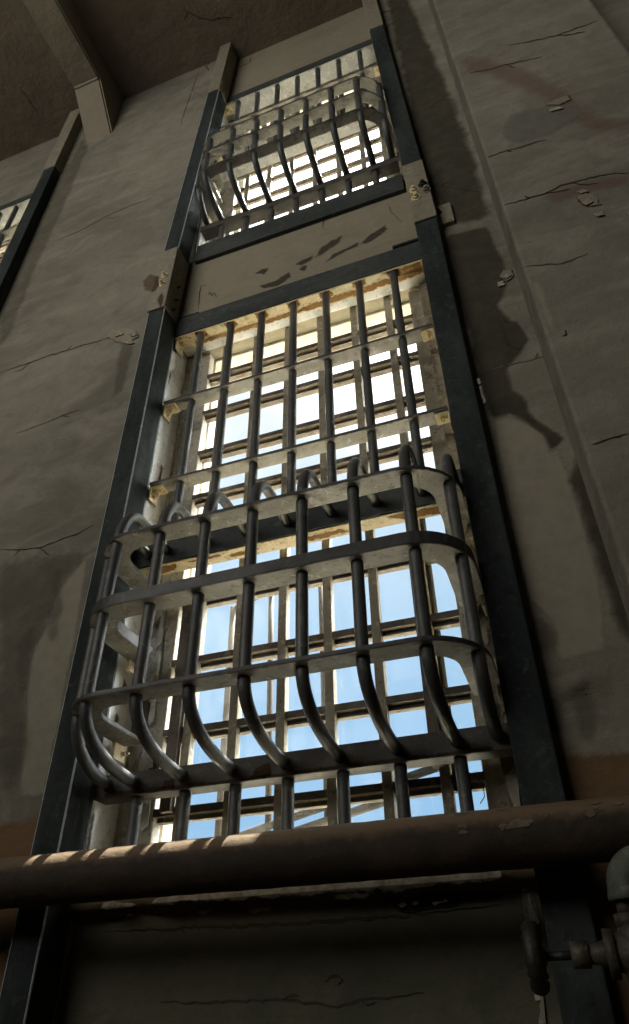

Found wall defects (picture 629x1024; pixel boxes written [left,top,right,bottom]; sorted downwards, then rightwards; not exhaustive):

crack [470,21,595,73]
crack [504,172,629,205]
crack [0,338,107,373]
crack [1,525,93,556]